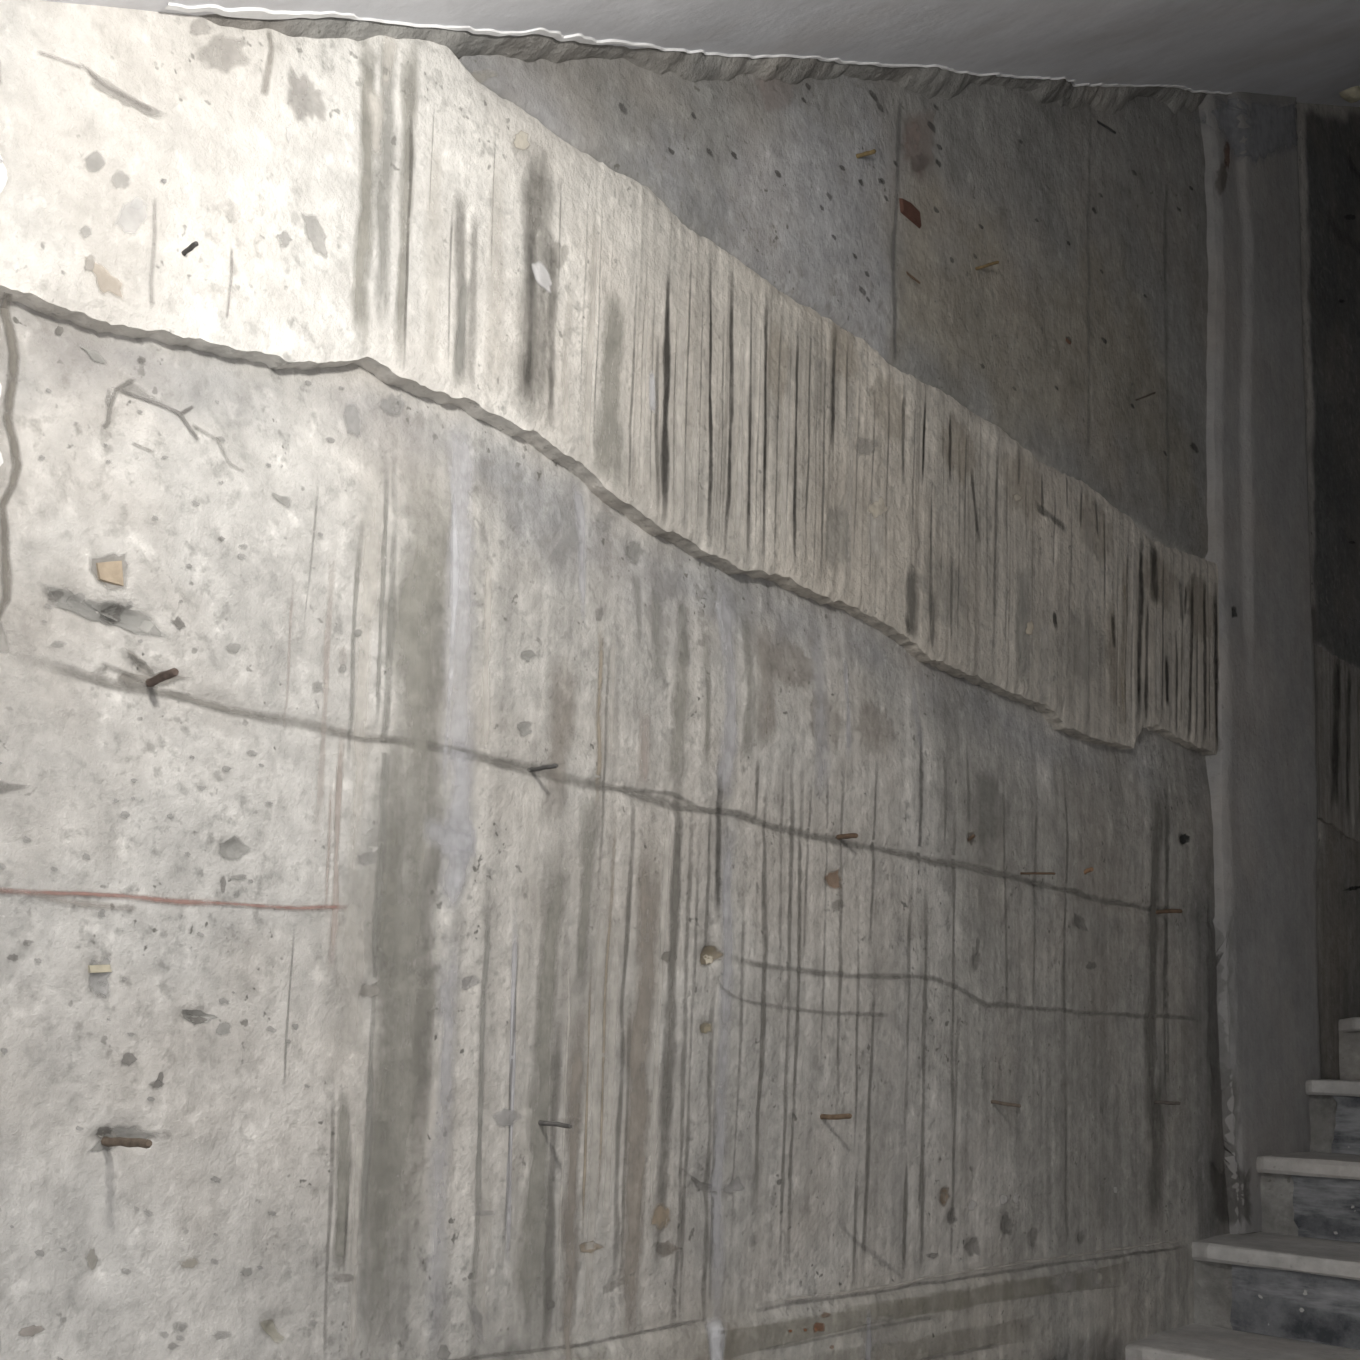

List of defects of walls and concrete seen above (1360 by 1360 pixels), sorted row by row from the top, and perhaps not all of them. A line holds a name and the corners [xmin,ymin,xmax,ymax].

water stain [355,44,415,327]
water stain [522,171,553,405]
water stain [586,288,848,545]
water stain [351,444,470,766]
water stain [1122,549,1218,741]
crack [5,890,338,910]
water stain [473,931,489,1269]
water stain [507,812,682,1360]
crack [72,657,1165,910]
crack [750,962,1186,1019]
crack [458,1322,689,1360]
crack [789,1241,1176,1304]